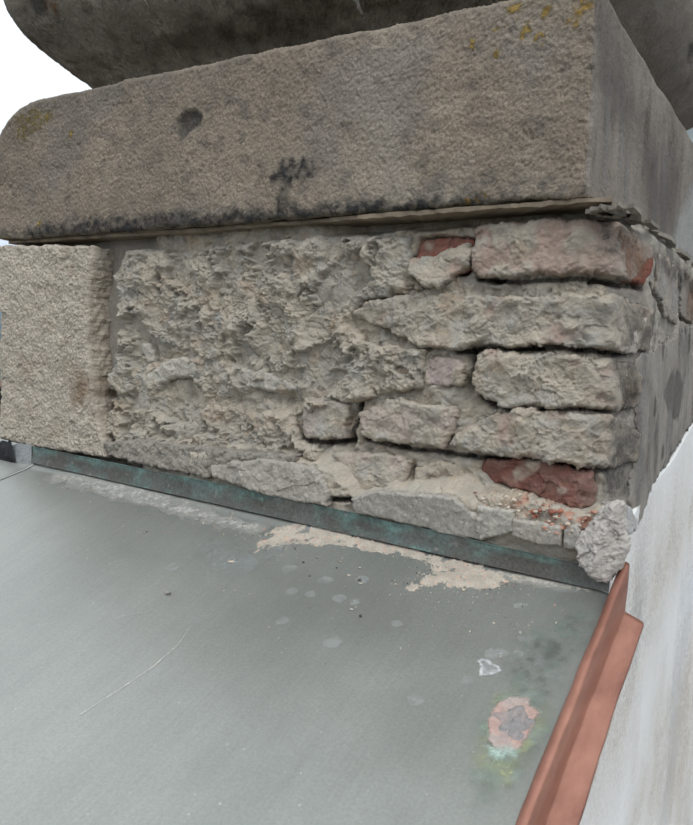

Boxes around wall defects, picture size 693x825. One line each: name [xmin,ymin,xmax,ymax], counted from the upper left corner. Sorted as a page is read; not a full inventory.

spalling [103,234,429,507]
flaking render [351,488,608,550]
corrosion [478,692,549,786]